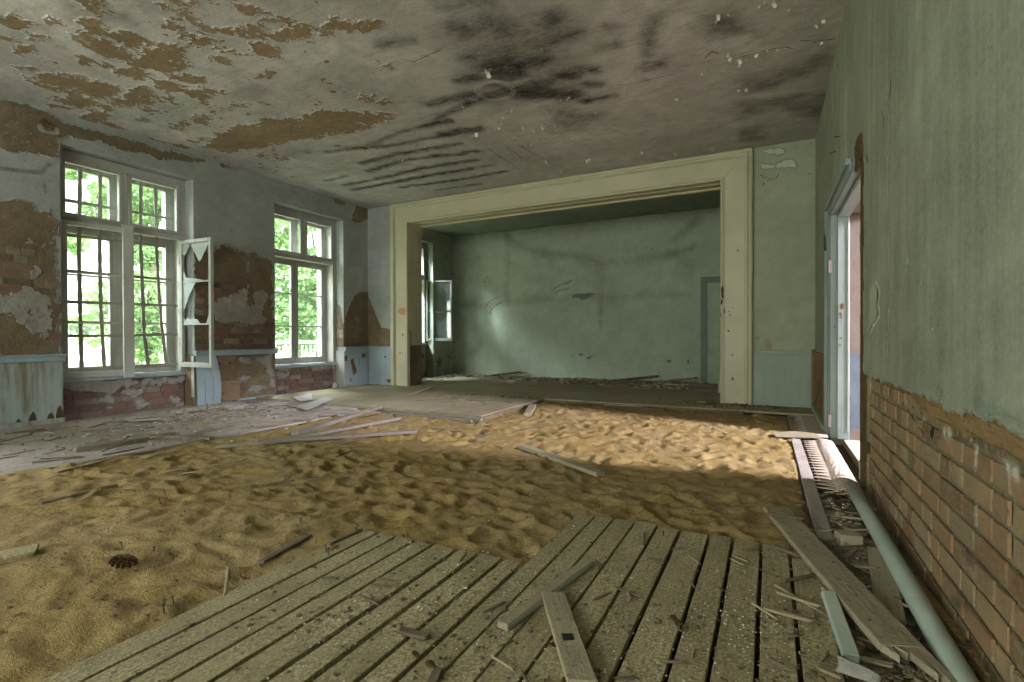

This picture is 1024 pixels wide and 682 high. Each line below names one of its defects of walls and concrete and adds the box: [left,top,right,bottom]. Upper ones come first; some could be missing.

peeling [0,0,397,177]
water stain [343,44,607,190]
peeling [0,197,62,356]
peeling [194,243,291,401]
peeling [333,198,368,225]
peeling [312,291,404,383]
spalling [863,361,1024,438]